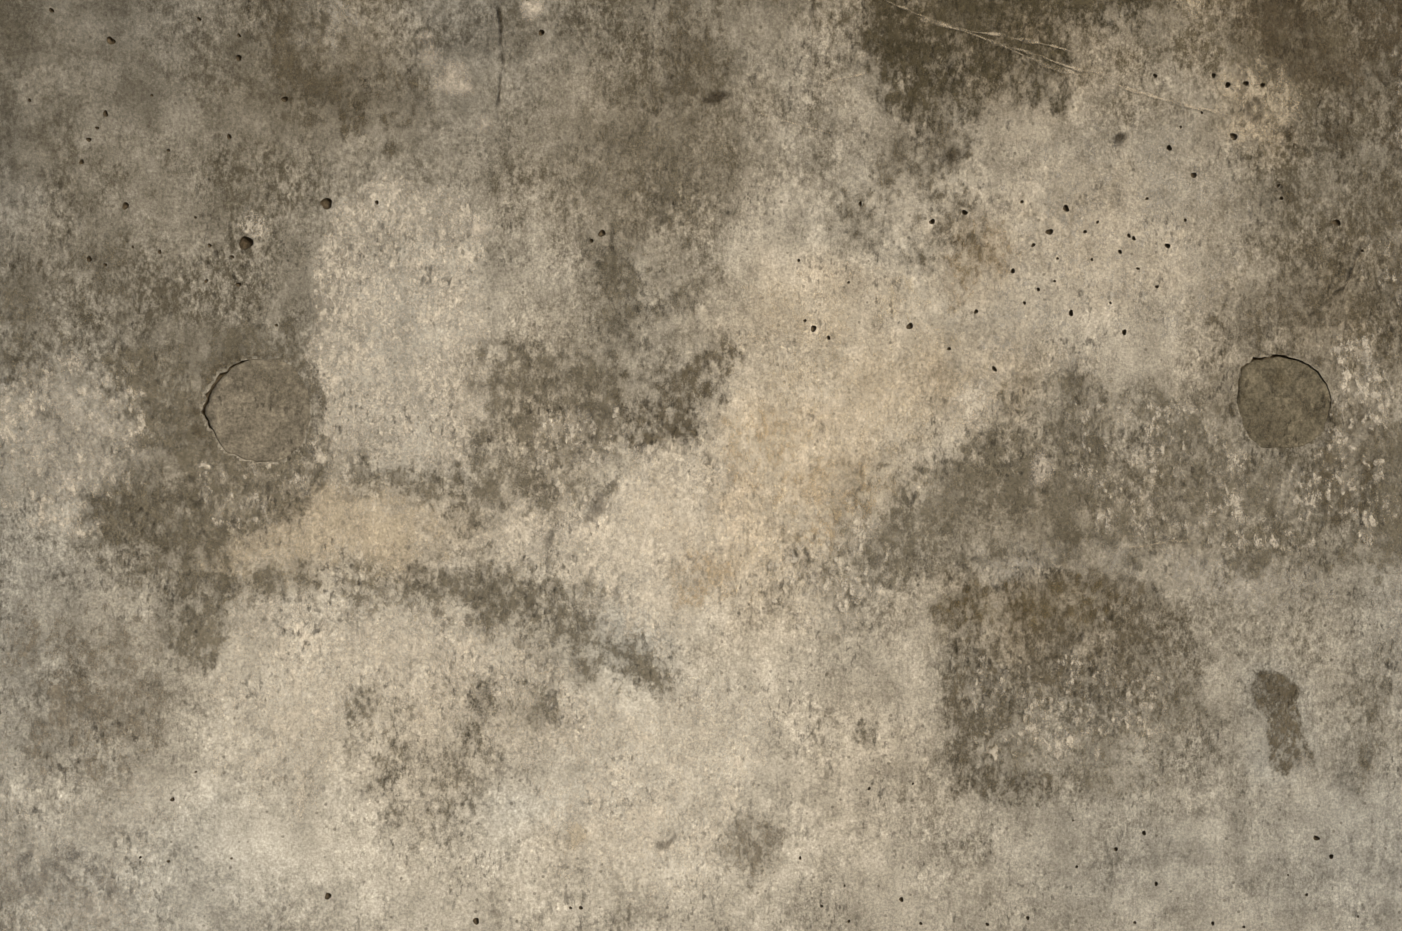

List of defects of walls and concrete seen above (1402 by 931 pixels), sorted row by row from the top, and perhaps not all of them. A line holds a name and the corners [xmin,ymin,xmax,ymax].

water stain [0,0,743,851]
water stain [771,0,1402,806]